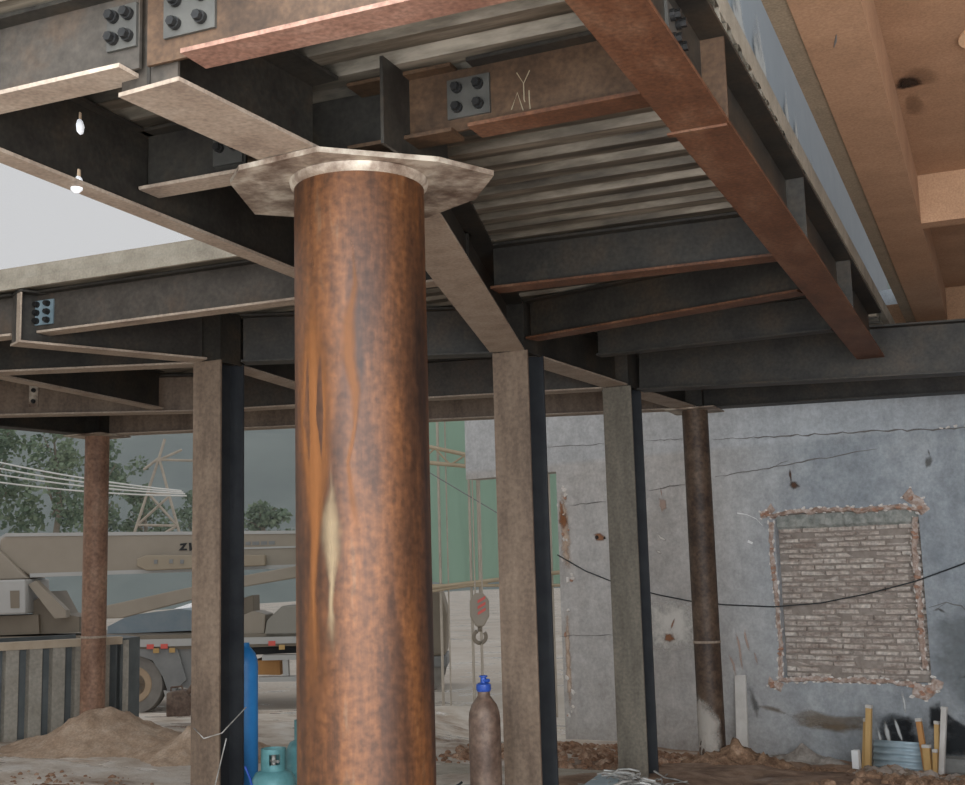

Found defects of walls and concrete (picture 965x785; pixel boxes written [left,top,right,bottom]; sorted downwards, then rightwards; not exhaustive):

rust [303,325,325,643]
crack [715,425,965,477]
spalling [759,487,944,702]